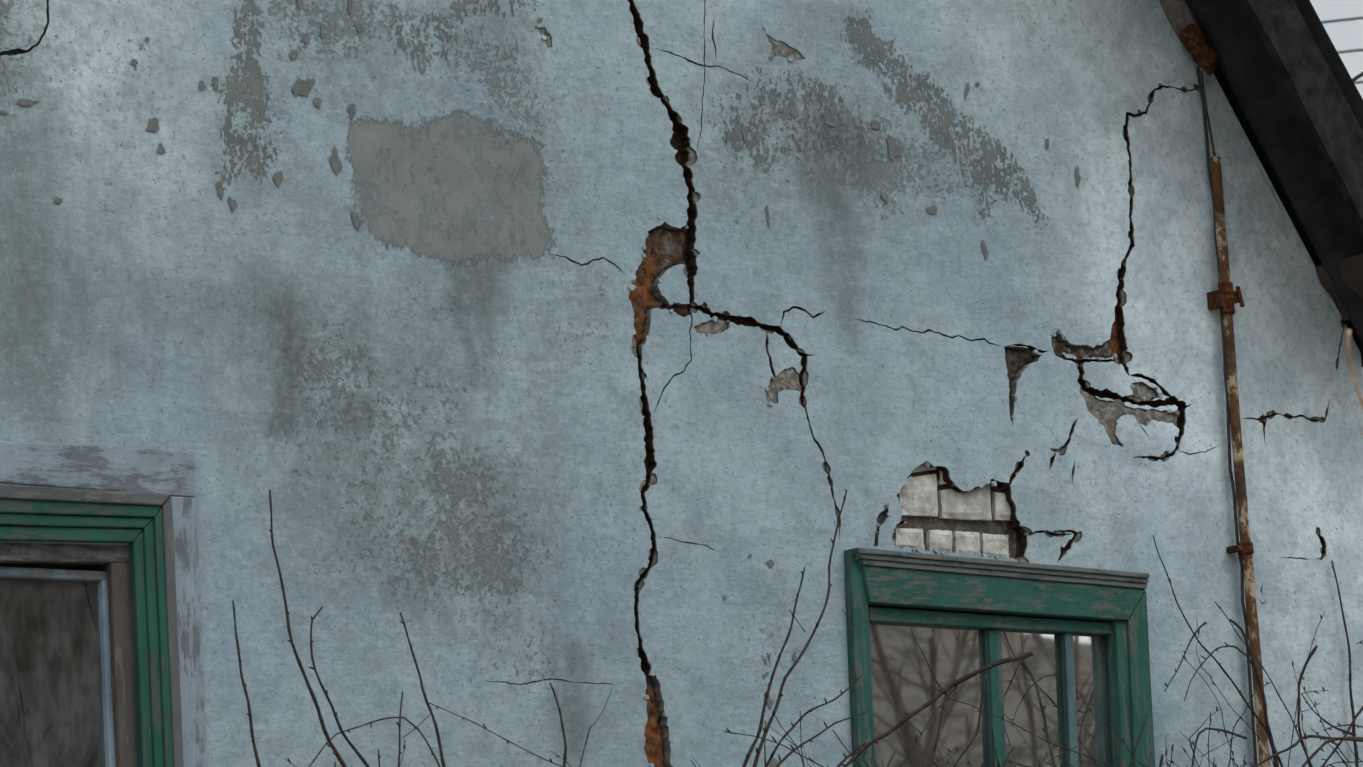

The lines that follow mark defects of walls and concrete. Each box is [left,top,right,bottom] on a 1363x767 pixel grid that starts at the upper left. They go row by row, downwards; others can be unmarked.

crack [0,0,49,56]
peeling [329,103,555,267]
peeling [717,26,902,175]
peeling [837,8,1049,260]
corrosion [630,255,655,344]
crack [488,0,841,685]
crack [856,84,1220,563]
flaking render [1004,330,1117,425]
flaking render [1081,382,1180,446]
crack [1243,321,1346,445]
flaking render [874,461,1022,561]
corrosion [644,691,662,767]